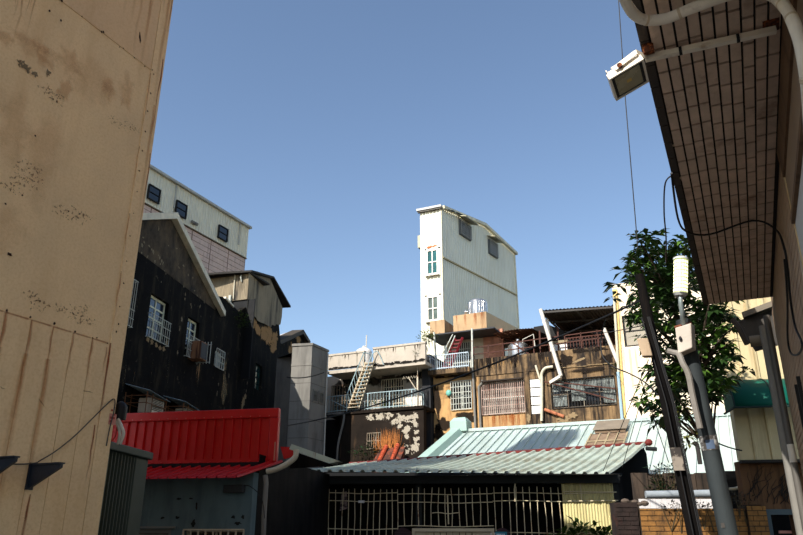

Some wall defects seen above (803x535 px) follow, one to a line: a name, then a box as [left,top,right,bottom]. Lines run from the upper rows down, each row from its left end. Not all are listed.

peeling [17,60,63,104]
peeling [253,318,278,353]
peeling [365,386,422,455]